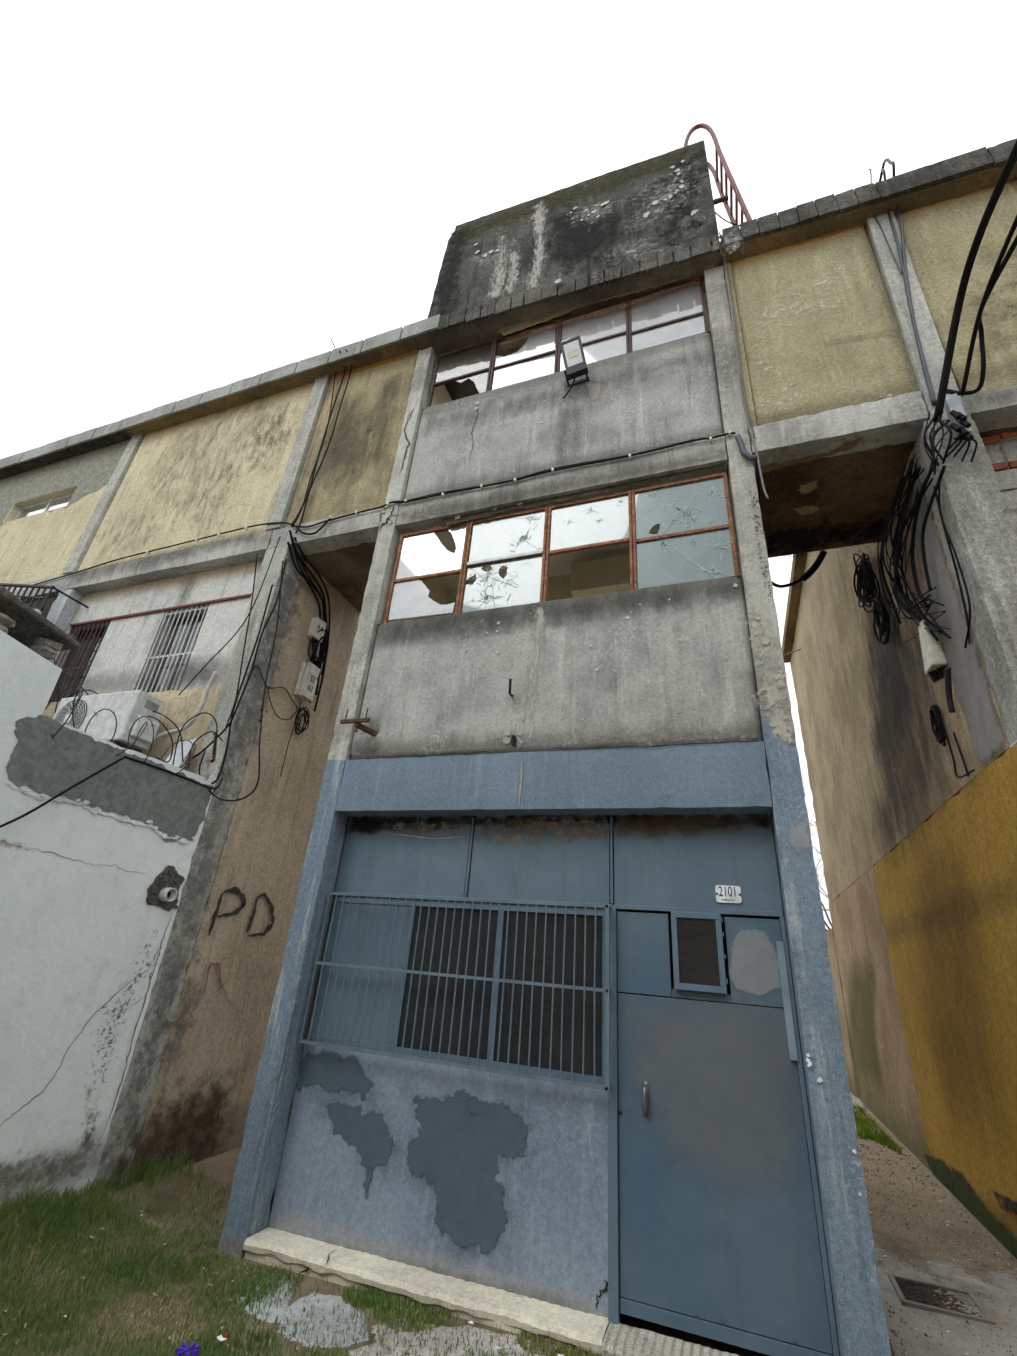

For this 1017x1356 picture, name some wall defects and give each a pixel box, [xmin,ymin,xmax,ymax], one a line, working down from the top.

water stain [432,227,469,315]
water stain [488,202,620,299]
peeling [5,715,213,843]
water stain [0,560,301,1193]
corrosion [483,815,756,844]
crack [0,914,172,1156]
spalling [86,865,185,1096]